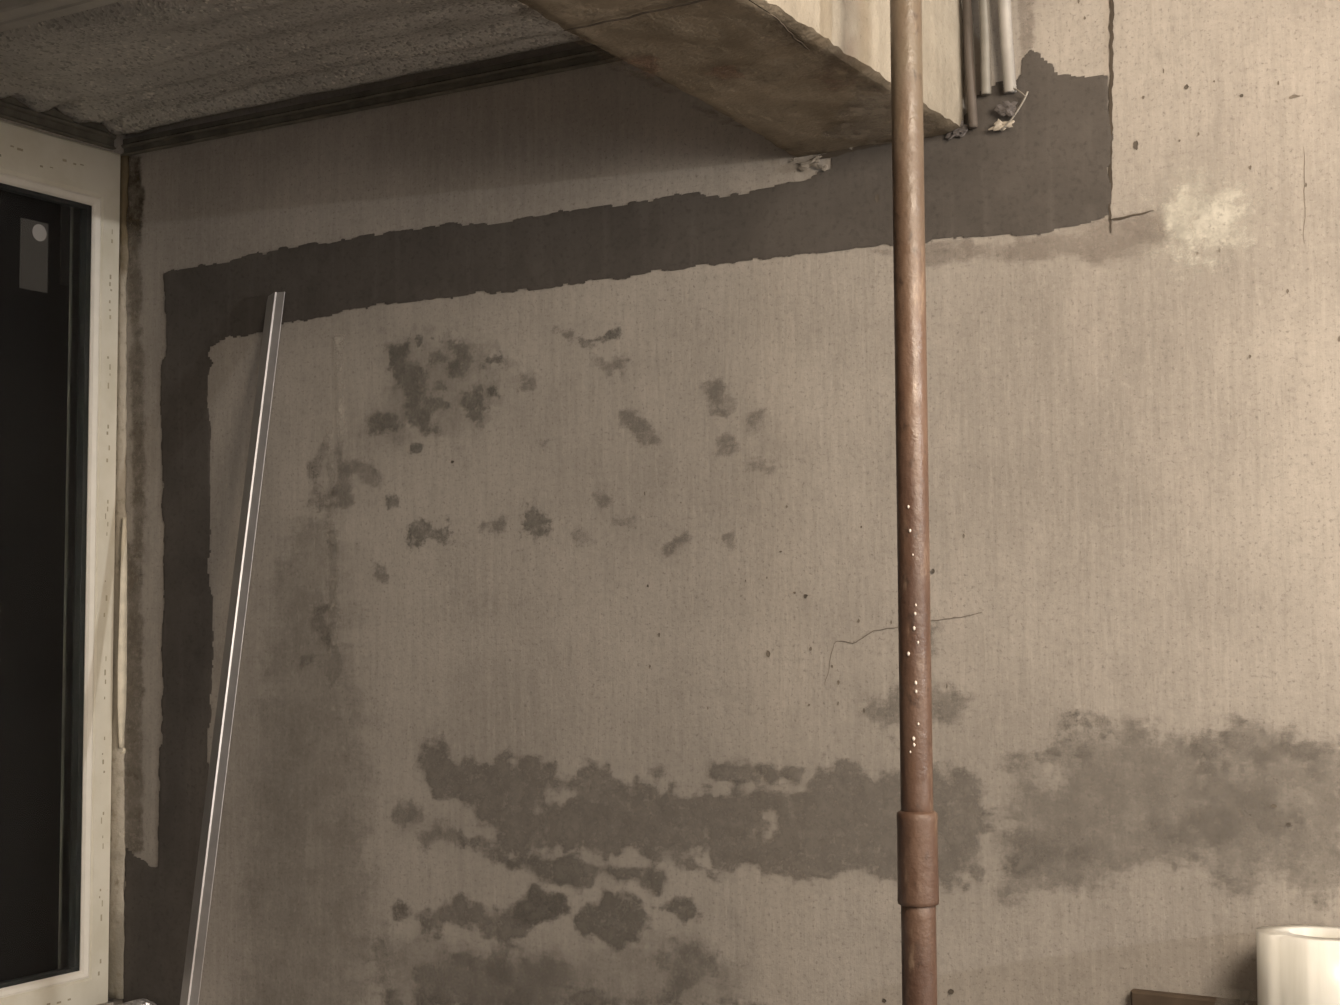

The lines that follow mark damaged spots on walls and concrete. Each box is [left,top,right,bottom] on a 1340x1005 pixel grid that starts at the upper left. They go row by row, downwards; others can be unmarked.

leakage [1163,183,1248,265]
leakage [370,335,502,453]
leakage [125,226,144,852]
crack [825,627,898,686]
leakage [393,741,901,949]
leakage [933,768,989,890]
leakage [1005,722,1340,885]